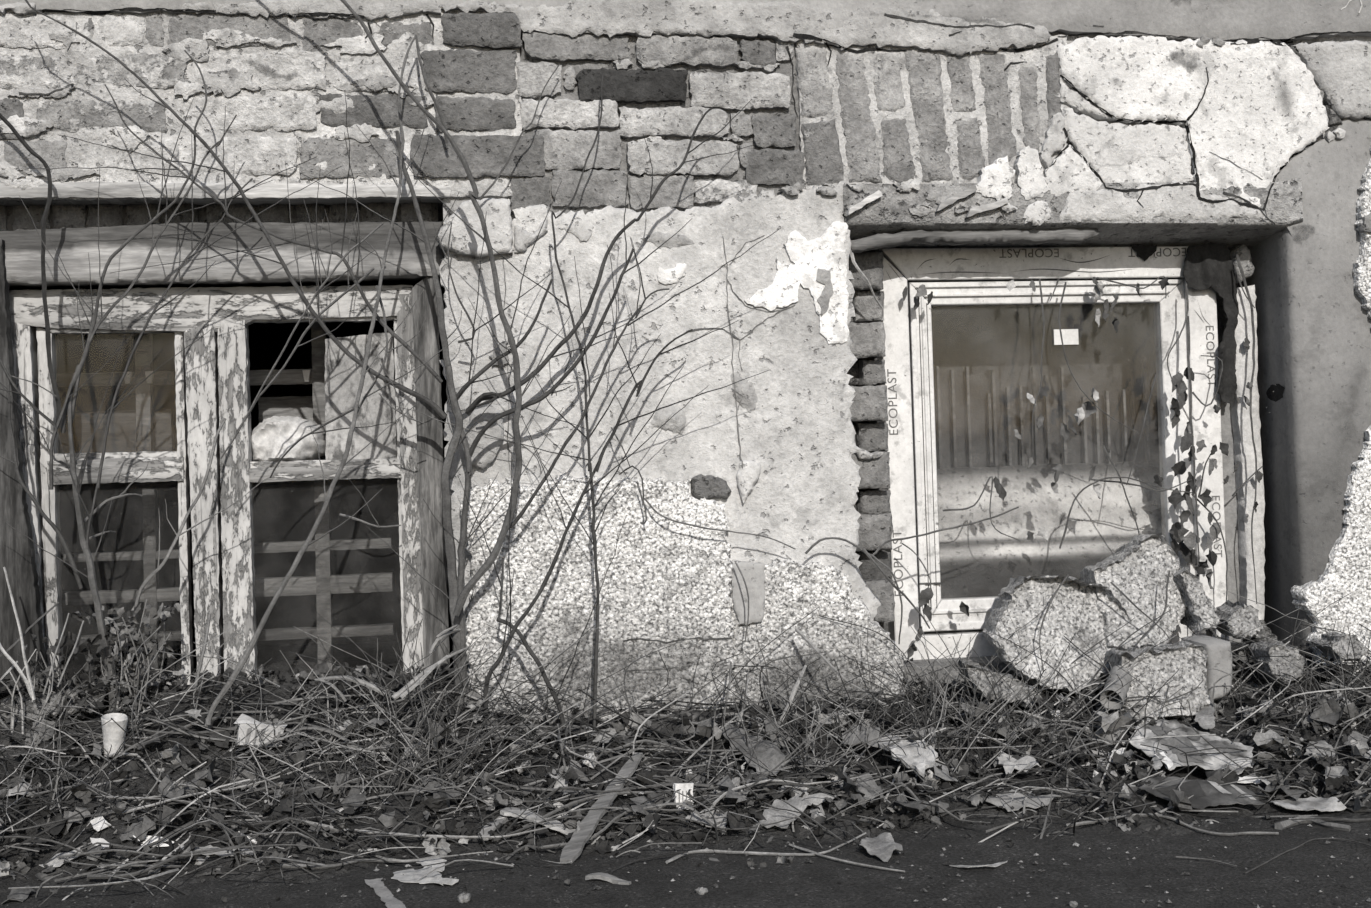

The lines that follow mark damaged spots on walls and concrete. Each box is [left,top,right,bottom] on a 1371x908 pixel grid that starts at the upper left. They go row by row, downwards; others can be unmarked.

flaking render [0,12,864,344]
crack [785,13,1371,225]
peeling [893,35,1371,582]
peeling [464,405,504,469]
spalling [691,460,761,504]
spalling [731,561,765,625]